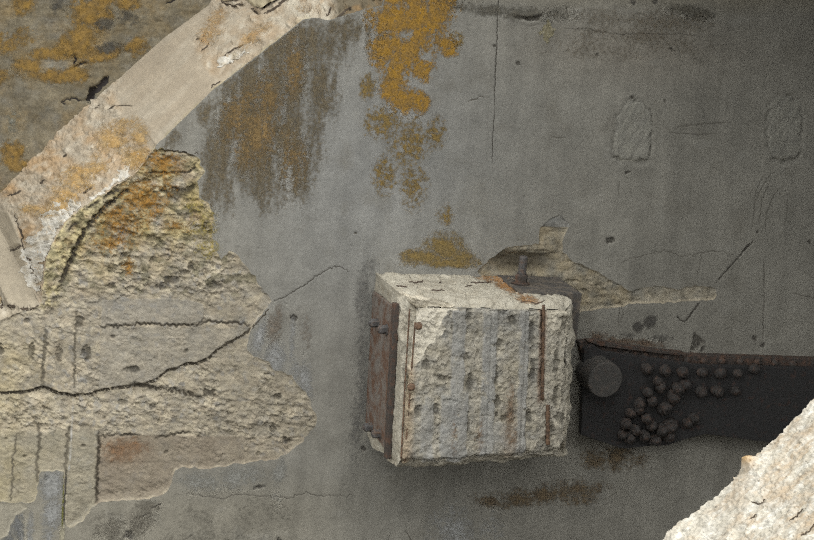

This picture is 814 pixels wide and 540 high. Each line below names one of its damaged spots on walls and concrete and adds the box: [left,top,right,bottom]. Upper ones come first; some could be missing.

water stain [198,16,371,211]
crack [468,0,499,161]
spalling [0,147,317,538]
crack [0,265,347,398]
rust [481,275,537,302]
spalling [478,214,754,322]